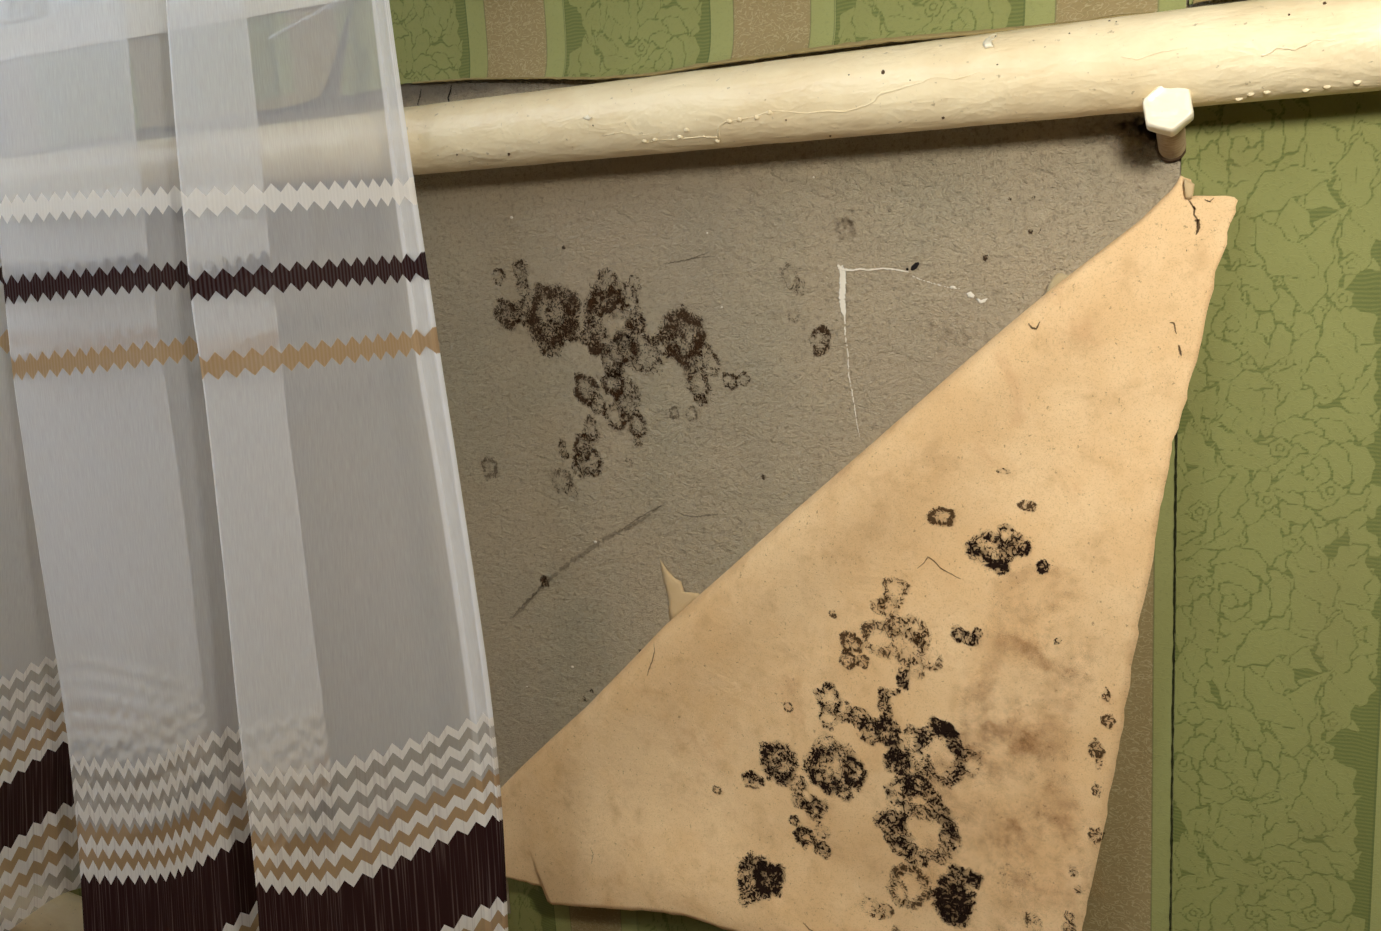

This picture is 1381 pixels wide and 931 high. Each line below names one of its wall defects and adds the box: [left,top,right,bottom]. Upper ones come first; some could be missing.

mould [493,259,751,497]
mould [927,506,955,527]
mould [965,523,1053,575]
leakage [1016,500,1037,512]
mould [737,578,983,931]
mould [1088,687,1116,798]